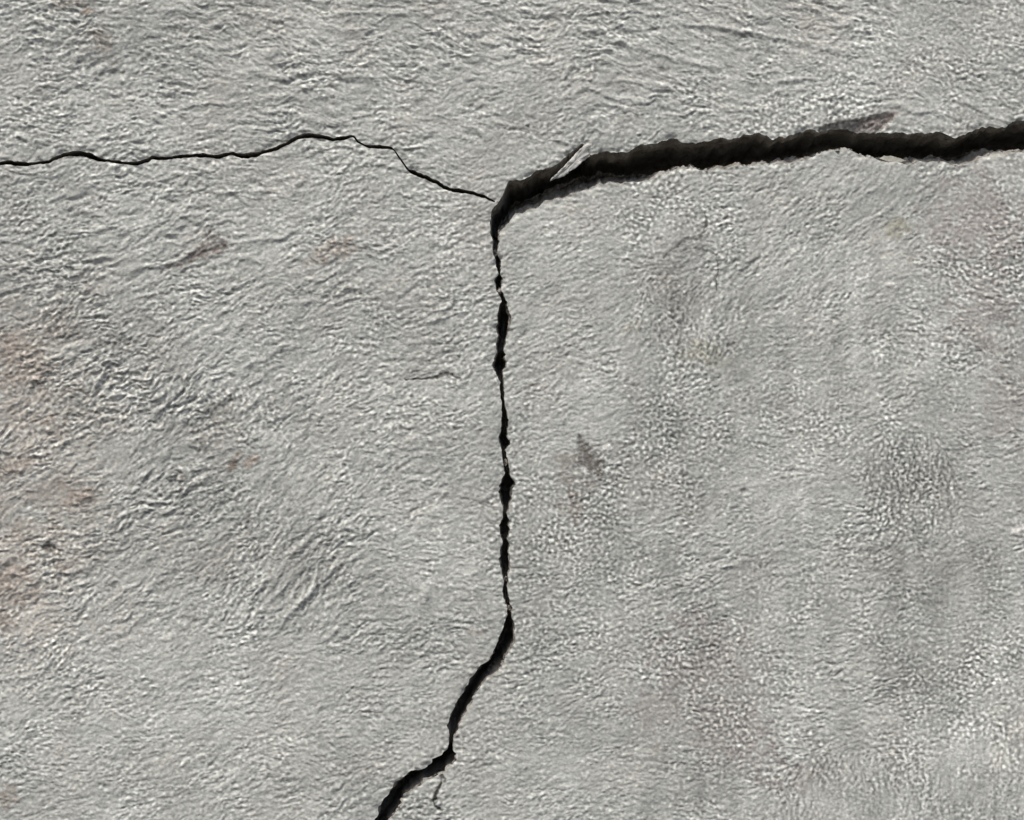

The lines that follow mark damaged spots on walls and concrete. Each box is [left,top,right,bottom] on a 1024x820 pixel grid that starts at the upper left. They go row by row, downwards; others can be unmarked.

crack [0,133,495,202]
crack [375,112,1024,820]